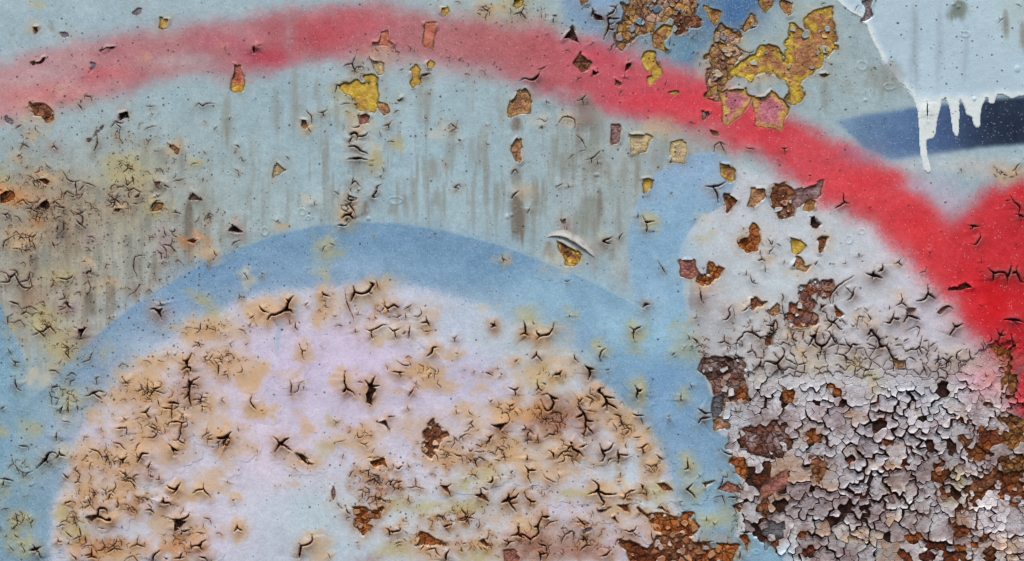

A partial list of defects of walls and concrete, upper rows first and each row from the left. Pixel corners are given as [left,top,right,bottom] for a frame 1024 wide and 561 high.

peeling [340,5,449,124]
crack [306,45,494,251]
crack [456,1,599,188]
peeling [581,0,838,136]
crack [0,80,457,561]
corrosion [0,87,925,561]
crack [333,252,1024,561]
peeling [678,256,724,286]
peeling [698,352,829,550]
peeling [720,161,843,332]
corrosion [925,337,1017,384]
peeling [958,401,1024,508]